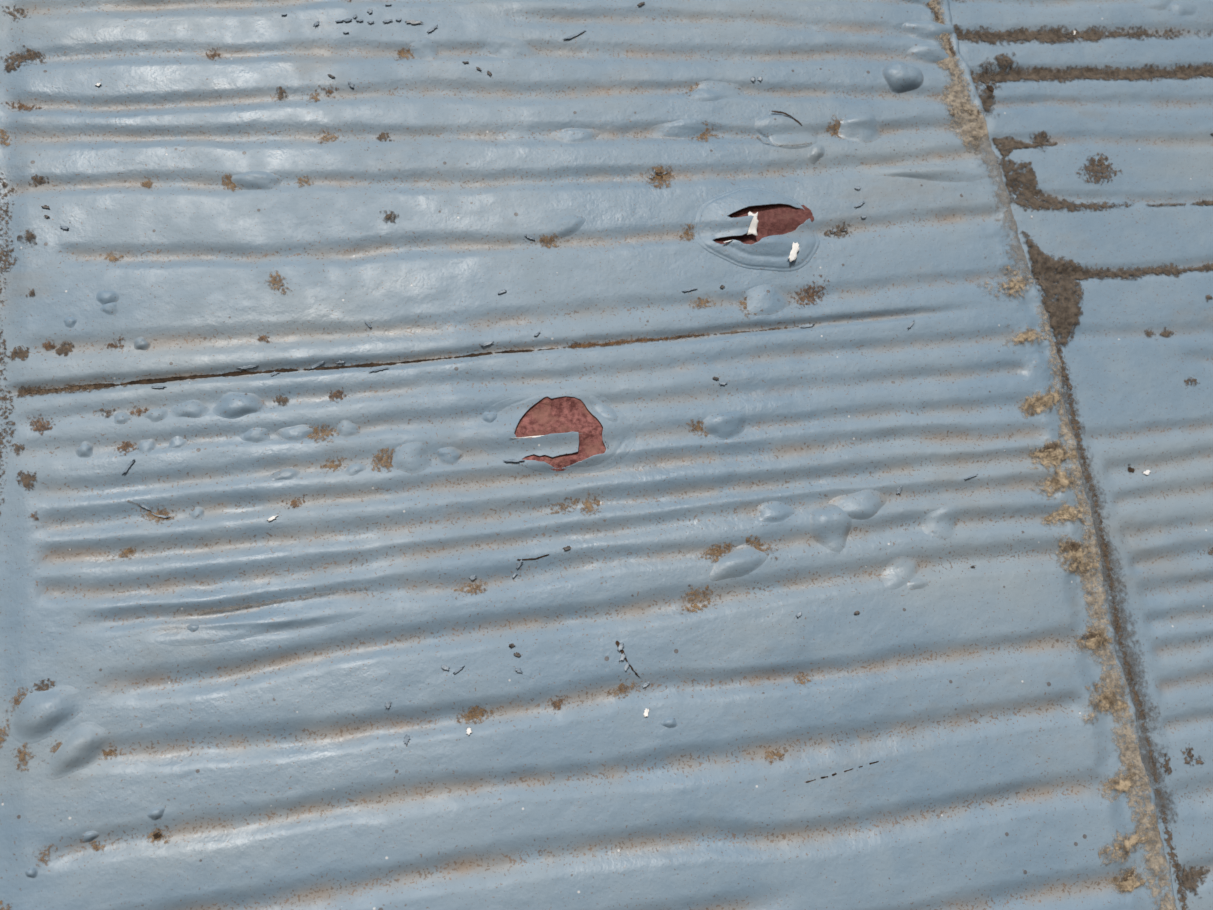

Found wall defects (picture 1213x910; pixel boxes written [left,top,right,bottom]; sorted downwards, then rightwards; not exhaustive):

peeling [693,187,820,272]
peeling [477,387,636,474]